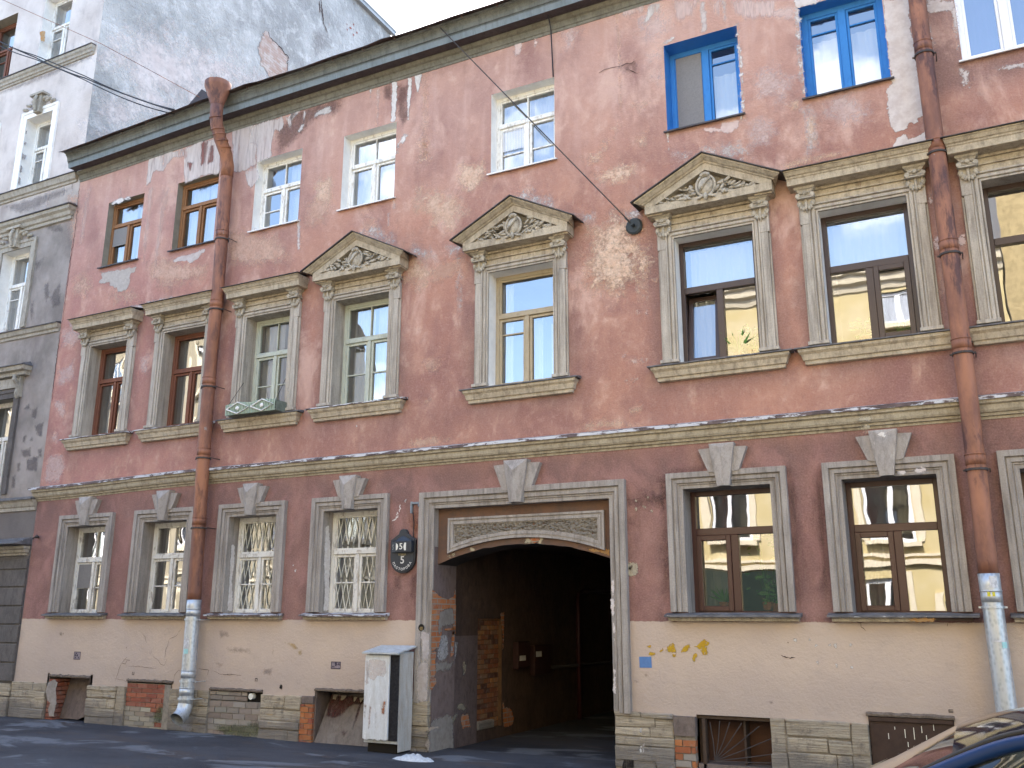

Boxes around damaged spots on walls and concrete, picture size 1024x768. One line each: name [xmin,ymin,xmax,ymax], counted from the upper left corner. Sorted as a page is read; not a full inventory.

flaking render [258,31,289,77]
spalling [883,0,926,147]
damp [369,74,426,122]
peeling [146,139,220,185]
peeling [232,106,331,187]
spalling [74,267,136,301]
peeling [151,249,205,286]
flaking render [418,589,456,690]